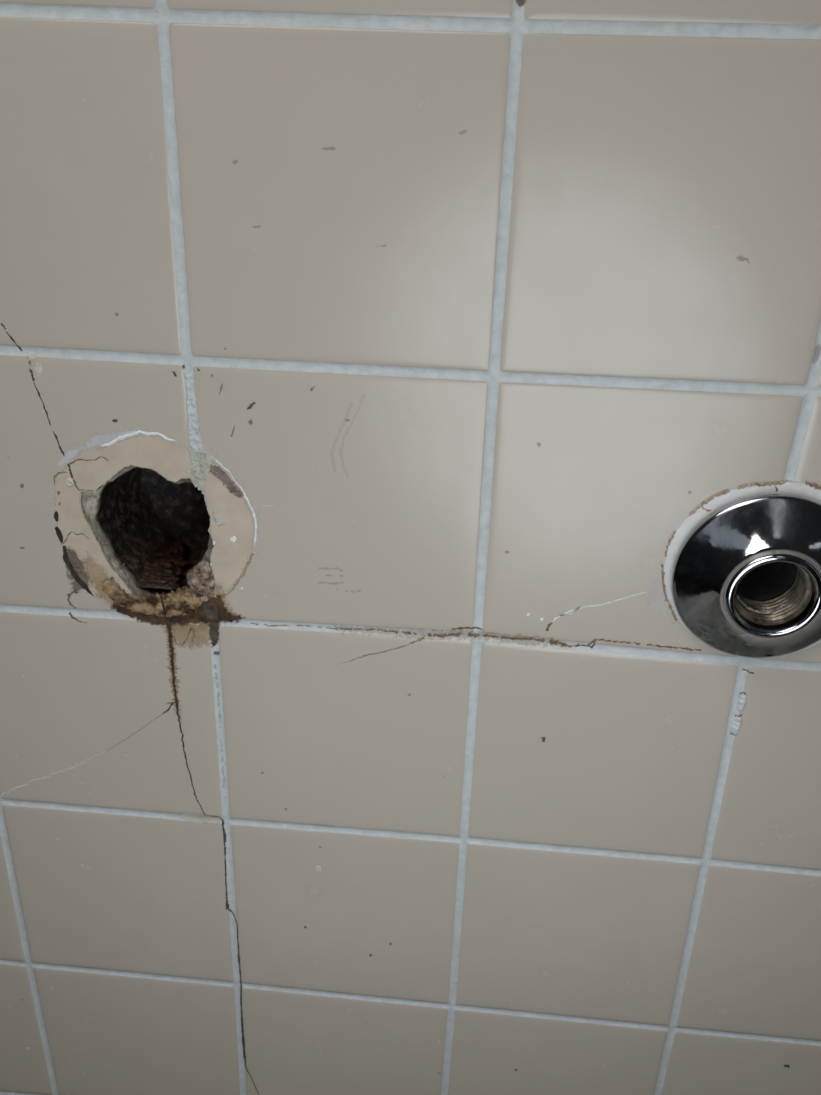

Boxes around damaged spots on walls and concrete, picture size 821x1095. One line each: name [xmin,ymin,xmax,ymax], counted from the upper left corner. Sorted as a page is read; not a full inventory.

crack [1,323,76,483]
spalling [54,477,93,623]
crack [250,592,702,661]
rust [661,531,677,621]
rust [689,481,787,515]
crack [160,596,259,1095]